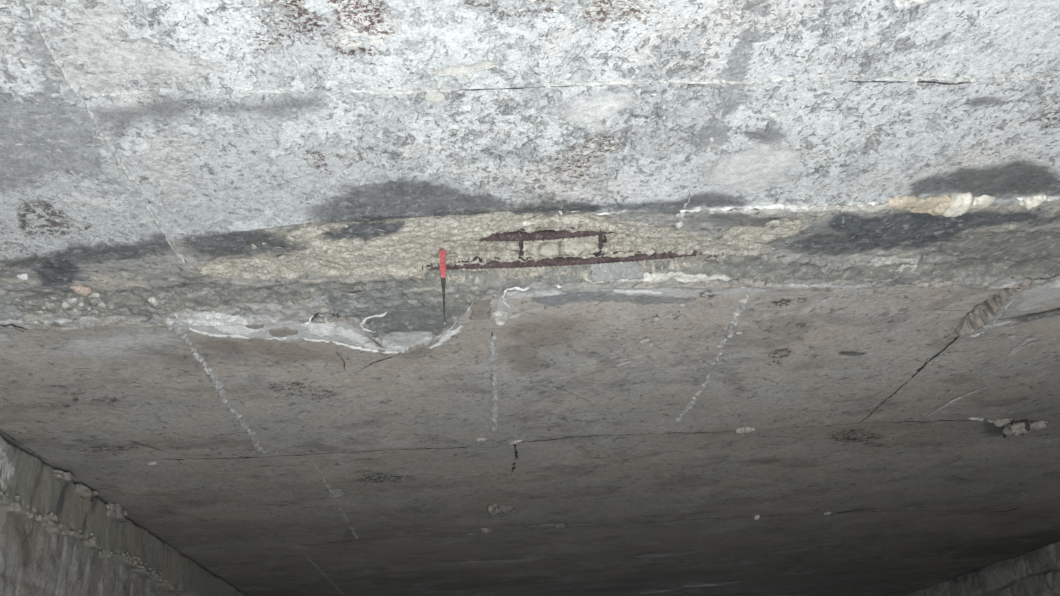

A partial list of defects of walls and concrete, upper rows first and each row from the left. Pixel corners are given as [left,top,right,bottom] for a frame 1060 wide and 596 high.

crack [849,79,971,87]
leakage [315,162,1060,255]
spalling [196,208,803,369]
spalling [859,274,1060,423]
crack [510,444,519,475]